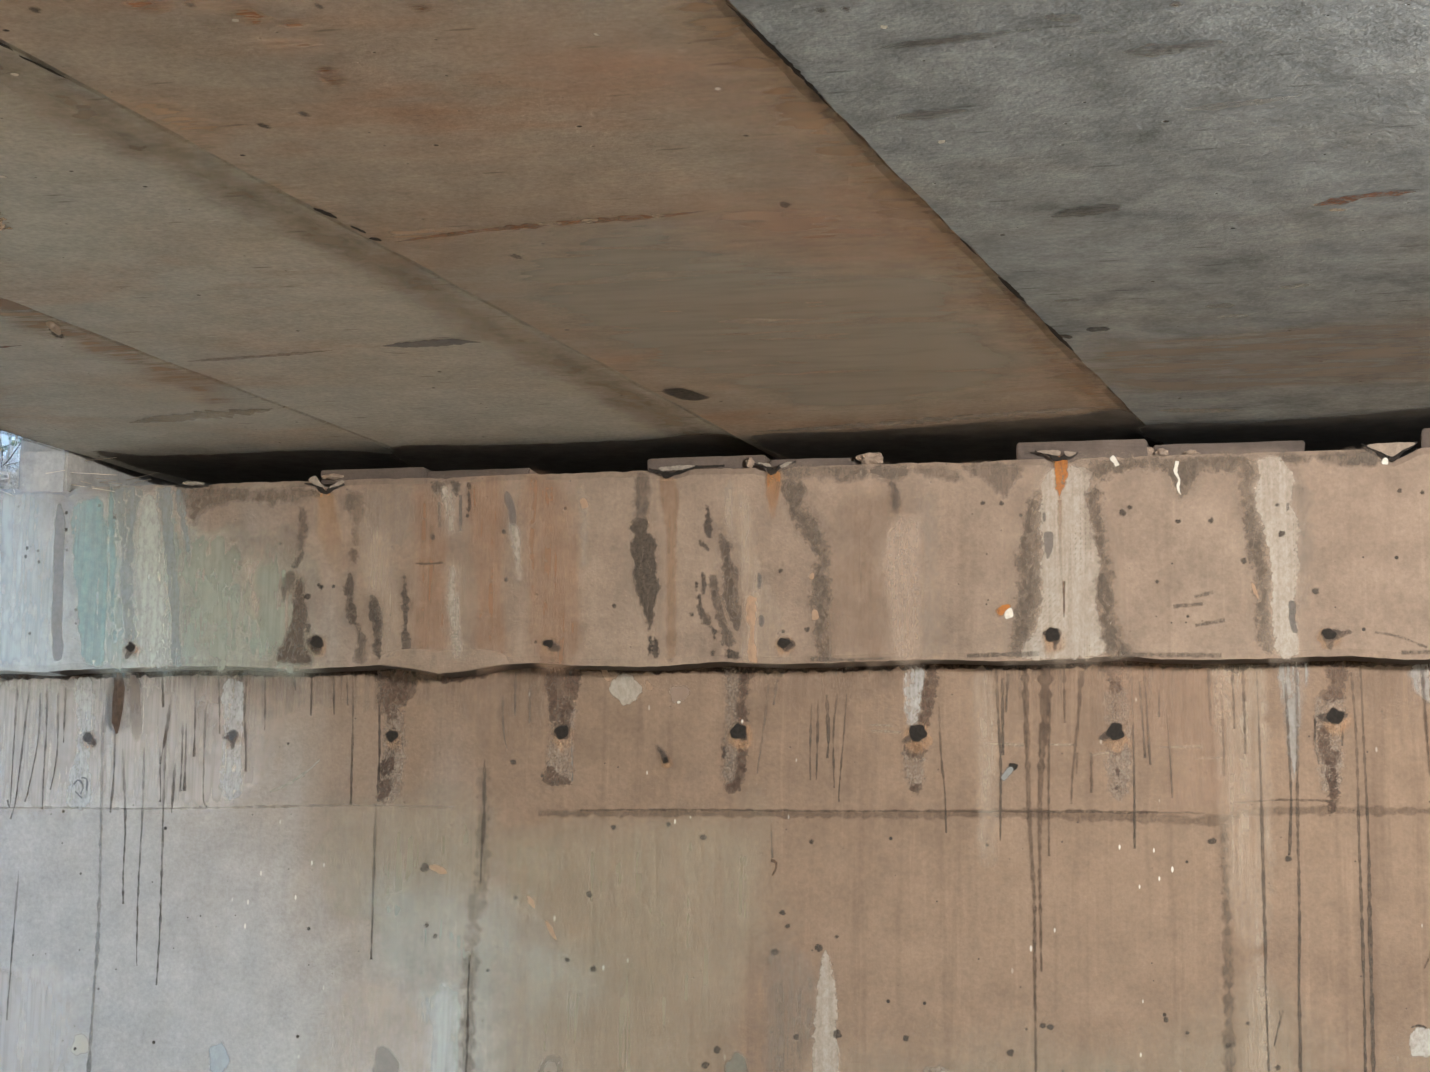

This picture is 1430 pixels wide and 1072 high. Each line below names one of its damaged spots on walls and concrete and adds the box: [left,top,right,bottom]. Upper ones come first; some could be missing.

leakage [98,359,1430,1072]
rust [1054,456,1068,497]